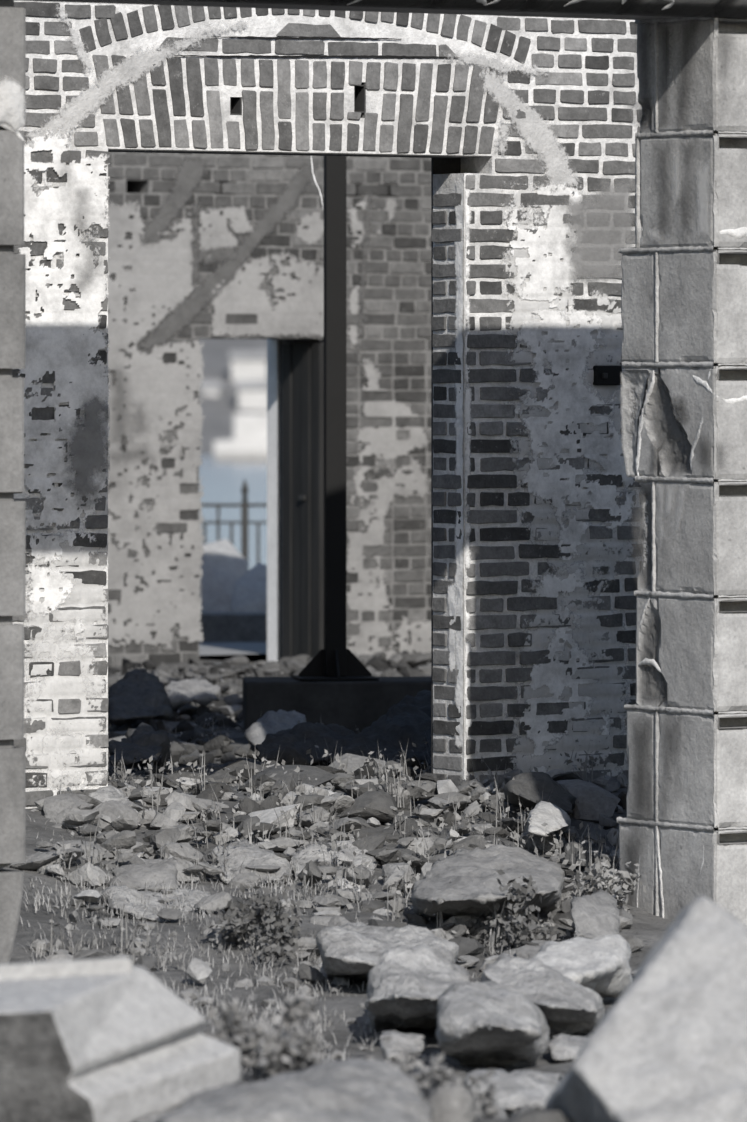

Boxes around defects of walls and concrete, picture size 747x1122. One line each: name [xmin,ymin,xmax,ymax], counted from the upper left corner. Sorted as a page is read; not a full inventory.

crack [476,0,500,8]
crack [661,0,674,10]
flaking render [348,195,398,248]
crack [719,227,747,239]
flaking render [347,285,362,349]
crack [635,370,655,476]
crack [690,367,747,470]
flaking render [18,129,324,790]
flaking render [346,358,431,660]
peeling [501,183,692,777]
crack [640,597,651,625]
crack [638,658,662,673]